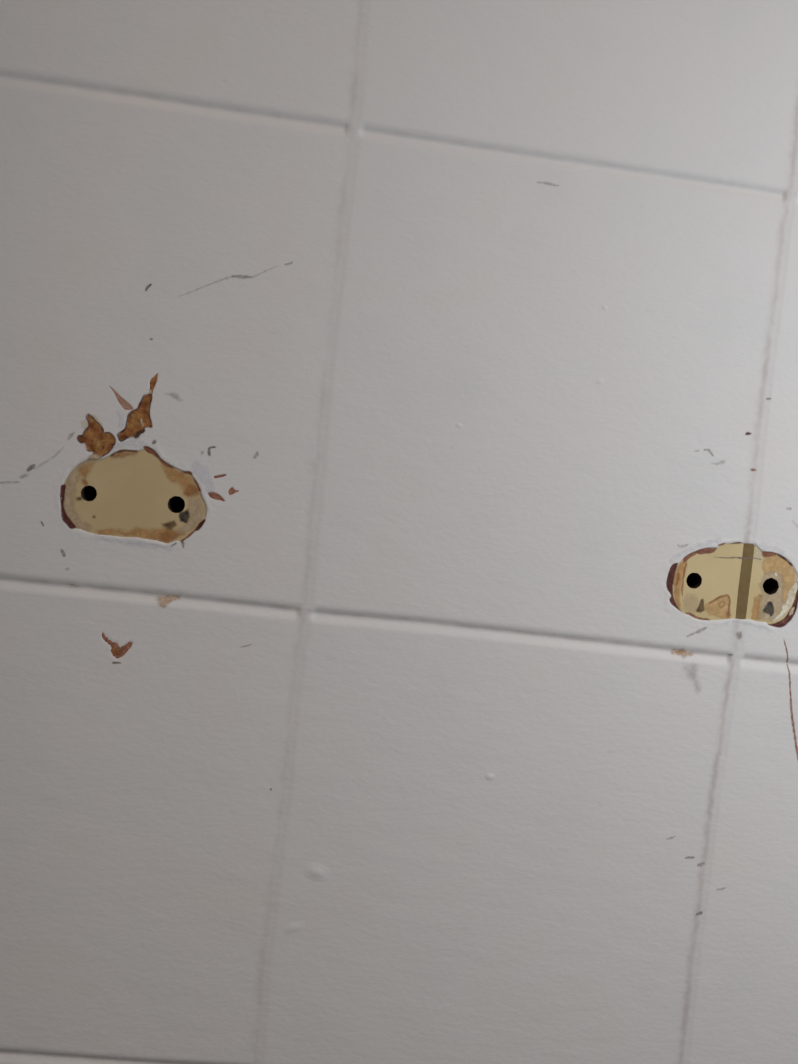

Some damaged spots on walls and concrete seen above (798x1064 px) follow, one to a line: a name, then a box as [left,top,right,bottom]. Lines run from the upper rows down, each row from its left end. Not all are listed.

peeling [51,373,239,553]
peeling [658,534,798,637]
spalling [102,633,132,664]
crack [784,641,798,758]